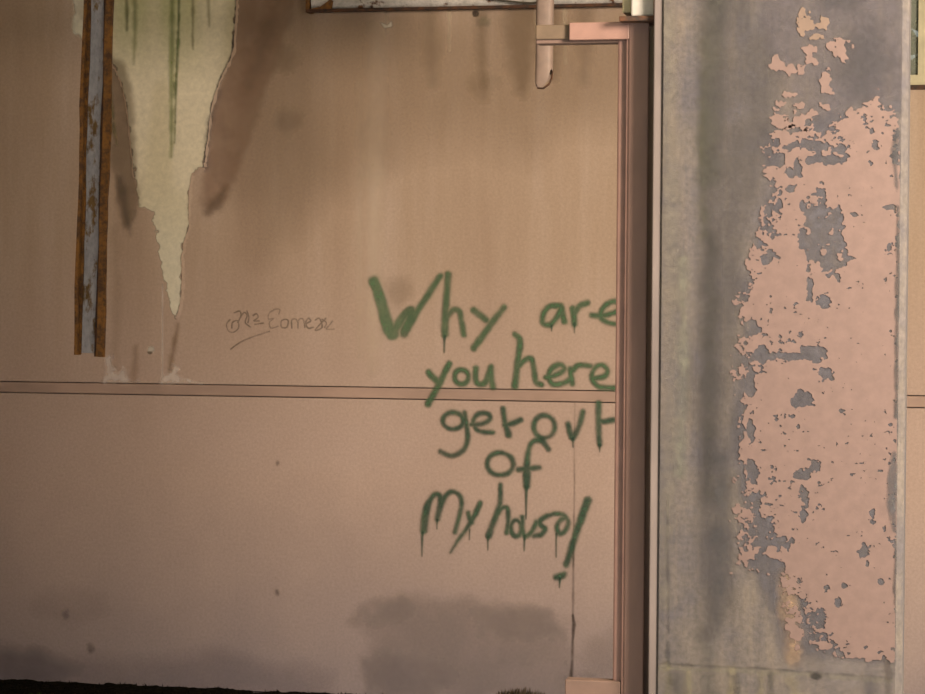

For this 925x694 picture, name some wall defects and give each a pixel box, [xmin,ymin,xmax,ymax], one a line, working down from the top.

water stain [861,105,899,166]
water stain [754,123,853,315]
water stain [746,319,835,393]
peeling [729,7,900,663]
water stain [735,404,761,443]
water stain [741,460,851,652]
water stain [856,508,893,567]